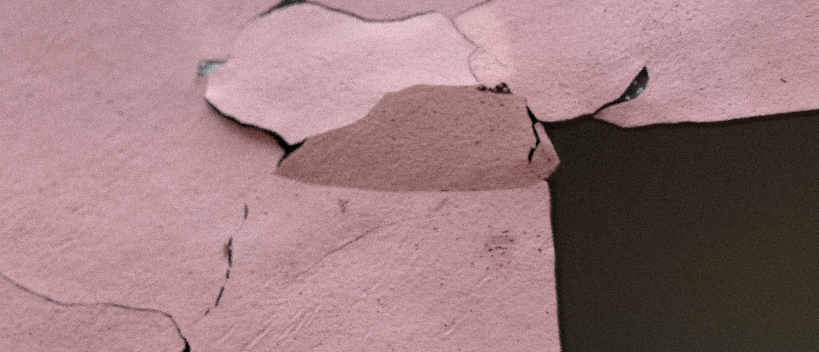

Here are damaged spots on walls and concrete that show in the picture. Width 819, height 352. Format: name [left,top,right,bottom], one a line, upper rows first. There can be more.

crack [239,0,509,82]
spalling [197,60,227,78]
spalling [476,82,512,94]
spalling [592,64,650,117]
crack [0,204,248,352]